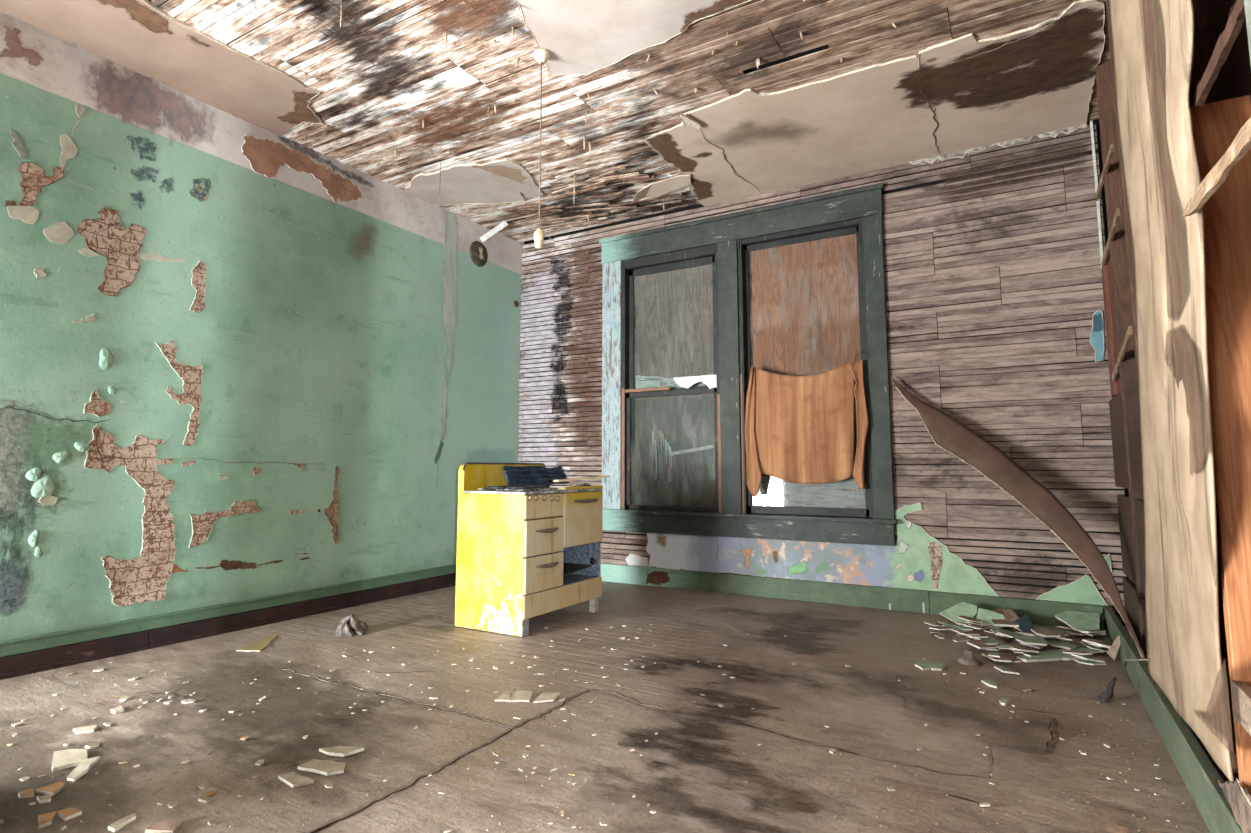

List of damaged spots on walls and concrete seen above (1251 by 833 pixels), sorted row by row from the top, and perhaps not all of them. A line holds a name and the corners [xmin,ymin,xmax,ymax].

peeling [0,26,43,66]
peeling [7,130,209,313]
peeling [76,62,205,141]
peeling [241,135,362,203]
crack [917,9,1071,156]
water stain [896,8,1109,109]
water stain [0,402,89,615]
peeling [83,339,283,607]
water stain [0,731,135,828]
water stain [179,664,373,770]
crack [281,668,1093,833]
water stain [607,657,824,833]